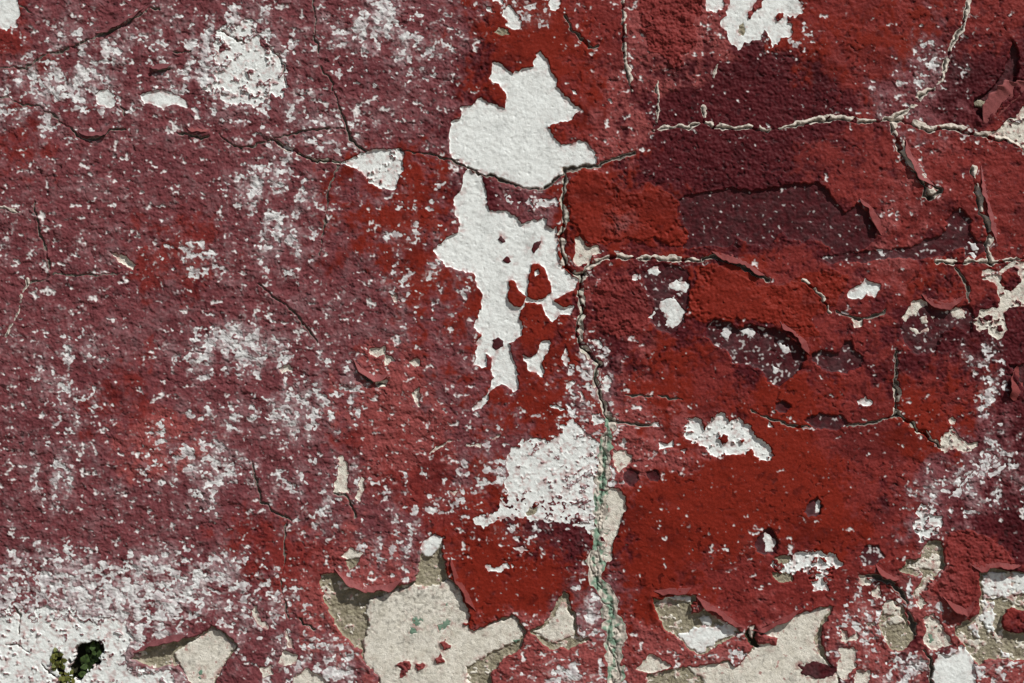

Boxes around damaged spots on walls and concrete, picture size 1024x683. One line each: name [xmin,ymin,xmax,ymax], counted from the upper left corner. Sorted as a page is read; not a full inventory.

peeling [0,0,453,273]
crack [178,0,367,256]
flaking render [0,312,660,683]
peeling [383,253,421,307]
crack [399,148,771,683]
peeling [400,52,986,411]
peeling [638,0,813,68]
crack [563,0,1024,201]
flaking render [622,261,1024,683]
crack [846,350,940,449]
crack [865,563,934,683]
crack [934,165,1024,303]